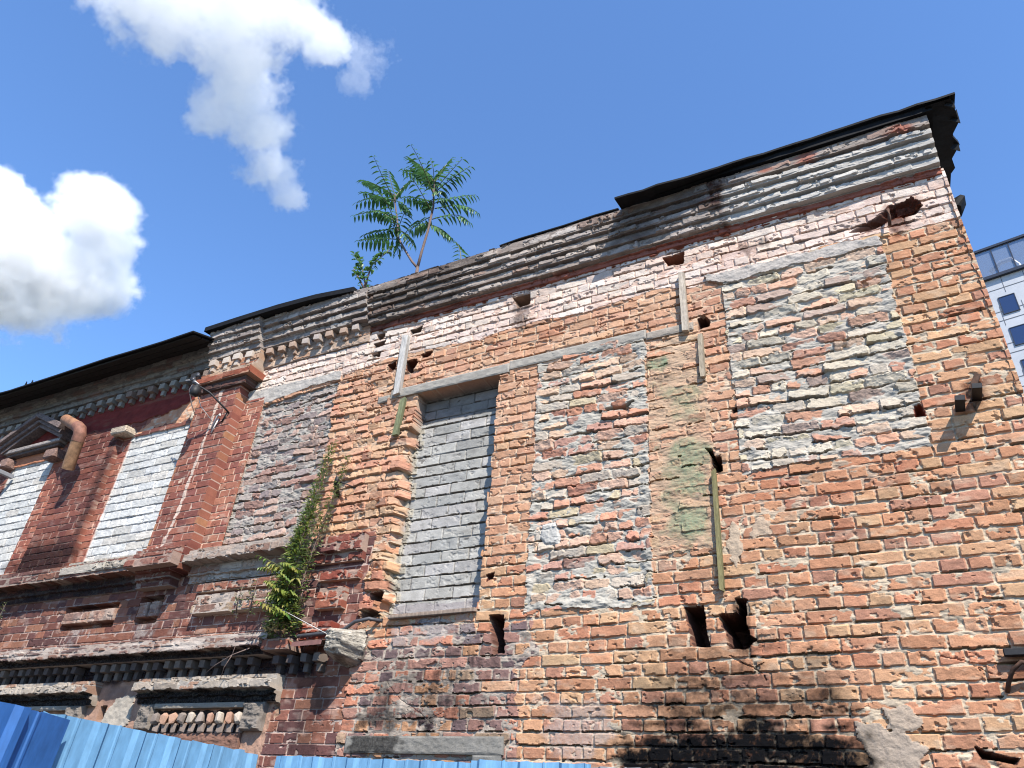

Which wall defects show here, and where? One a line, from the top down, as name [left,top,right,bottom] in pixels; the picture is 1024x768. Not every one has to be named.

spalling [849,196,923,233]